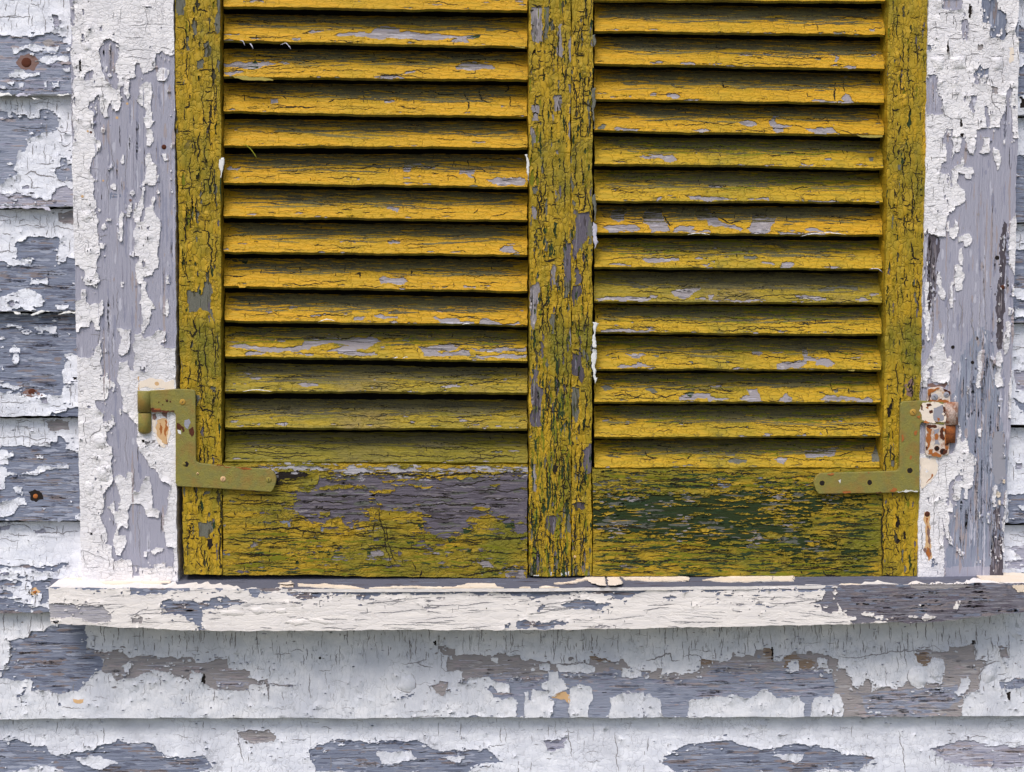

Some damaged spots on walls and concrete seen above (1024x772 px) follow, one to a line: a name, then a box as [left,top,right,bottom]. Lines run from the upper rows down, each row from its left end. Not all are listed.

peeling [176,0,290,86]
peeling [292,26,485,45]
crack [0,0,1024,580]
peeling [433,309,520,325]
peeling [216,334,397,358]
peeling [752,350,835,369]
peeling [679,385,761,402]
peeling [819,385,888,402]
corrosion [901,378,950,457]
corrosion [923,512,932,560]
peeling [307,625,1024,772]
peeling [0,734,217,772]